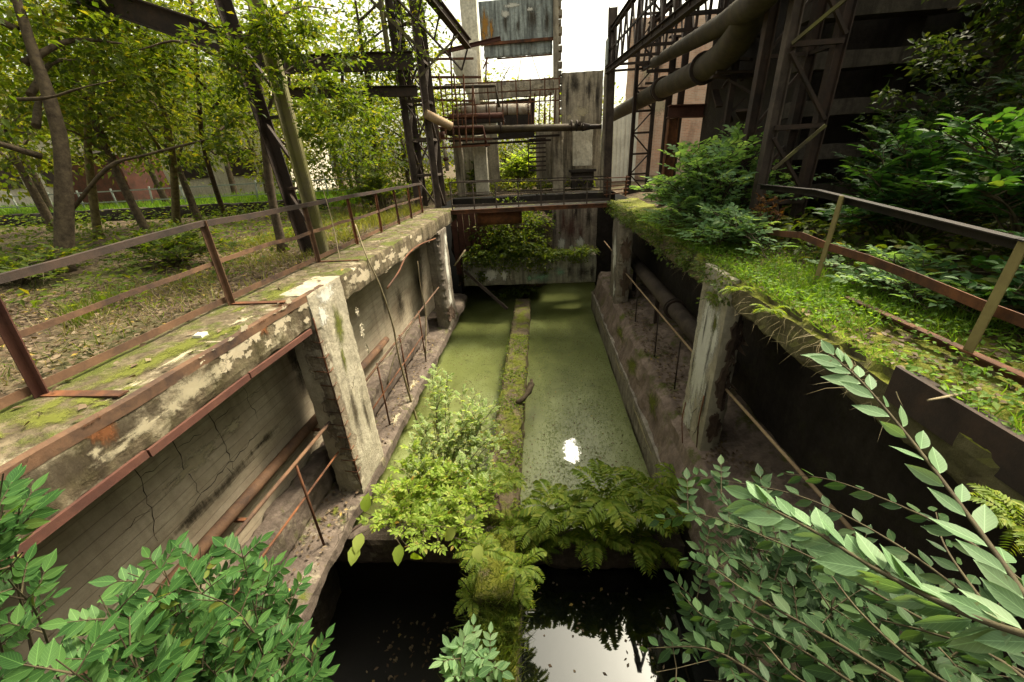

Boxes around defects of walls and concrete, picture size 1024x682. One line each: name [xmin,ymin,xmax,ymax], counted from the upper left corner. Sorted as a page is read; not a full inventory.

spalling [344,233,456,322]
spalling [355,307,369,353]
spalling [191,285,362,490]
crack [127,390,257,541]
water stain [181,463,245,527]